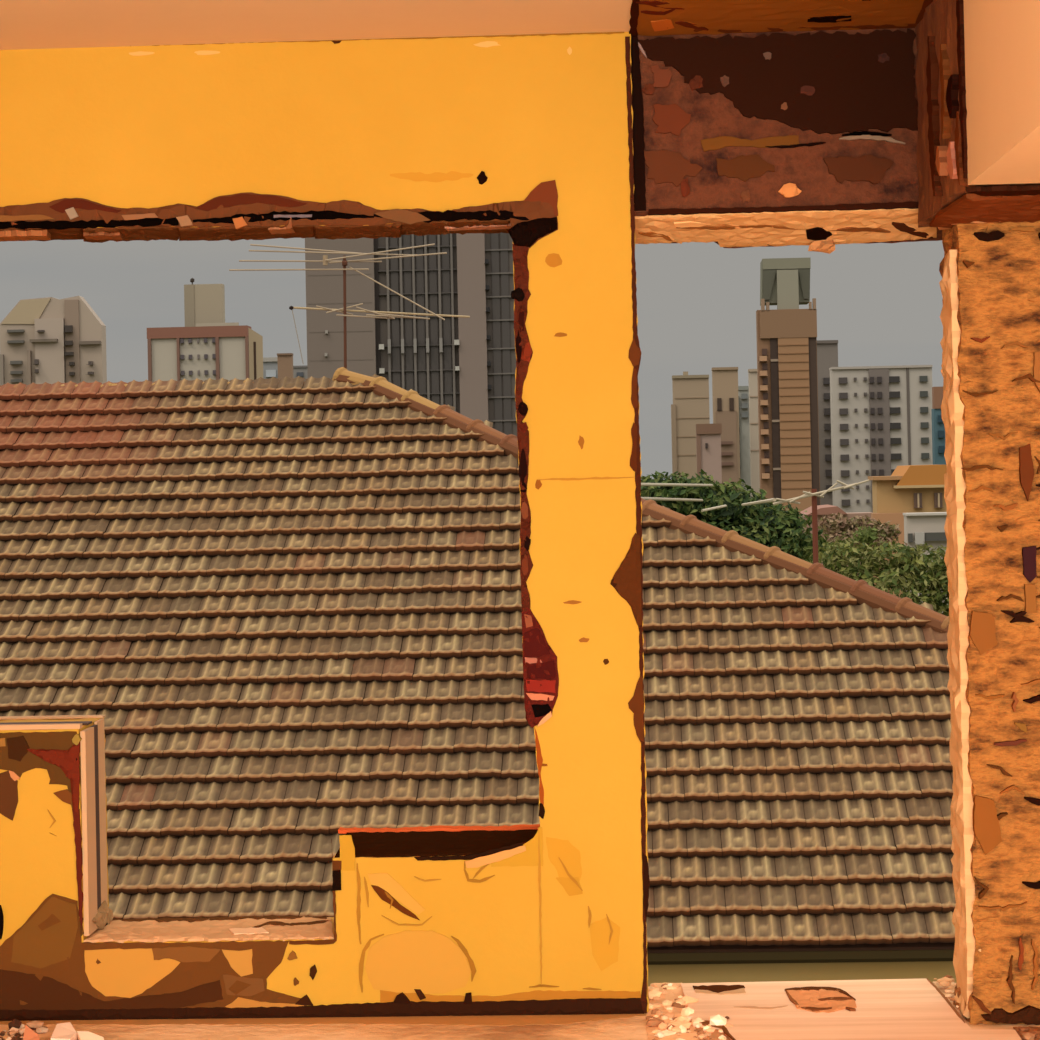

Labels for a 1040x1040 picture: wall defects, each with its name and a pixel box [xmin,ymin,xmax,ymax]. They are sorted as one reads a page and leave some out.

spalling [0,180,559,728]
spalling [610,0,1040,1014]
peeling [0,731,545,1008]